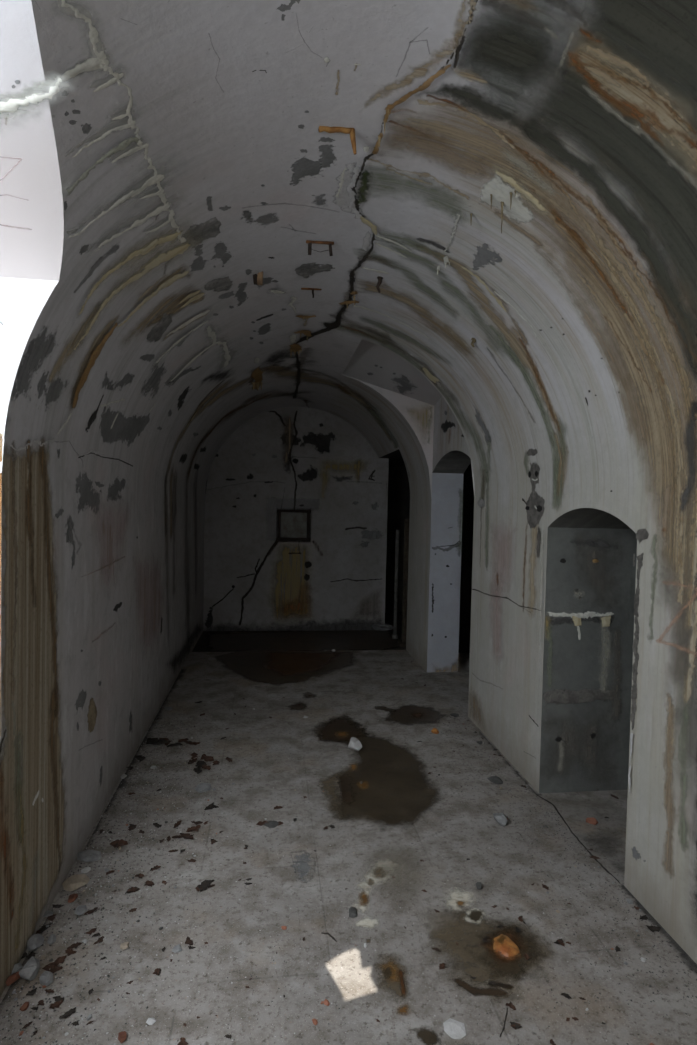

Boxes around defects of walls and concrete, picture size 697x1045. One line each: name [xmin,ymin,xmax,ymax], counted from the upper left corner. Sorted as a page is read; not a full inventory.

leakage [0,0,191,405]
flaking render [99,406,162,445]
spalling [103,313,194,416]
flaking render [290,137,336,186]
crack [268,0,478,510]
rust [363,64,697,574]
rust [567,28,697,164]
flaking render [55,474,126,568]
crack [205,539,279,628]
leakage [480,134,697,874]